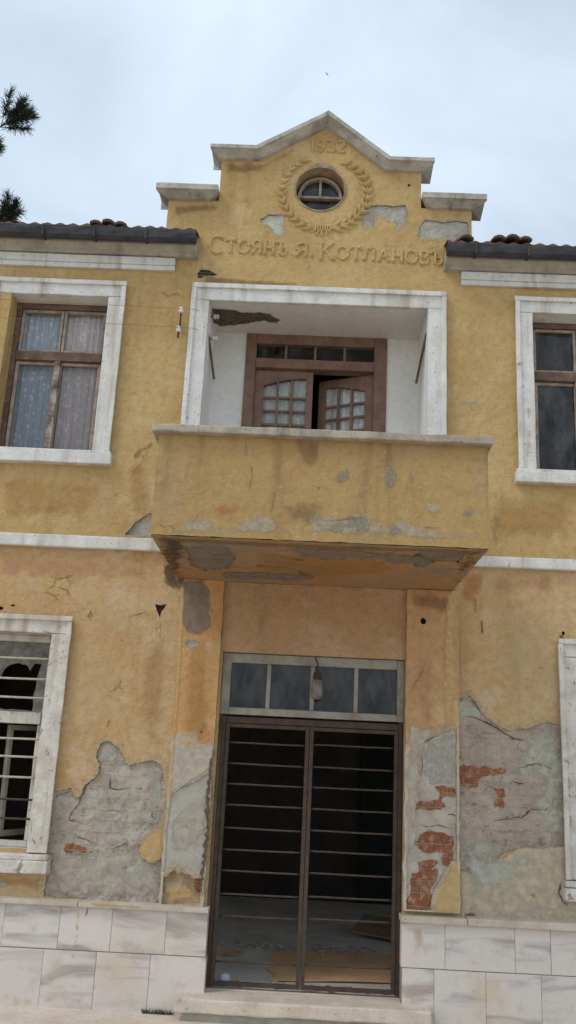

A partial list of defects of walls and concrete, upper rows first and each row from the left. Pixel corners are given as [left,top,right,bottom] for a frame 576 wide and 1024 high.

flaking render [260,212,287,236]
flaking render [361,203,472,241]
flaking render [123,512,152,538]
peeling [181,544,313,648]
flaking render [36,738,214,906]
flaking render [406,690,565,911]